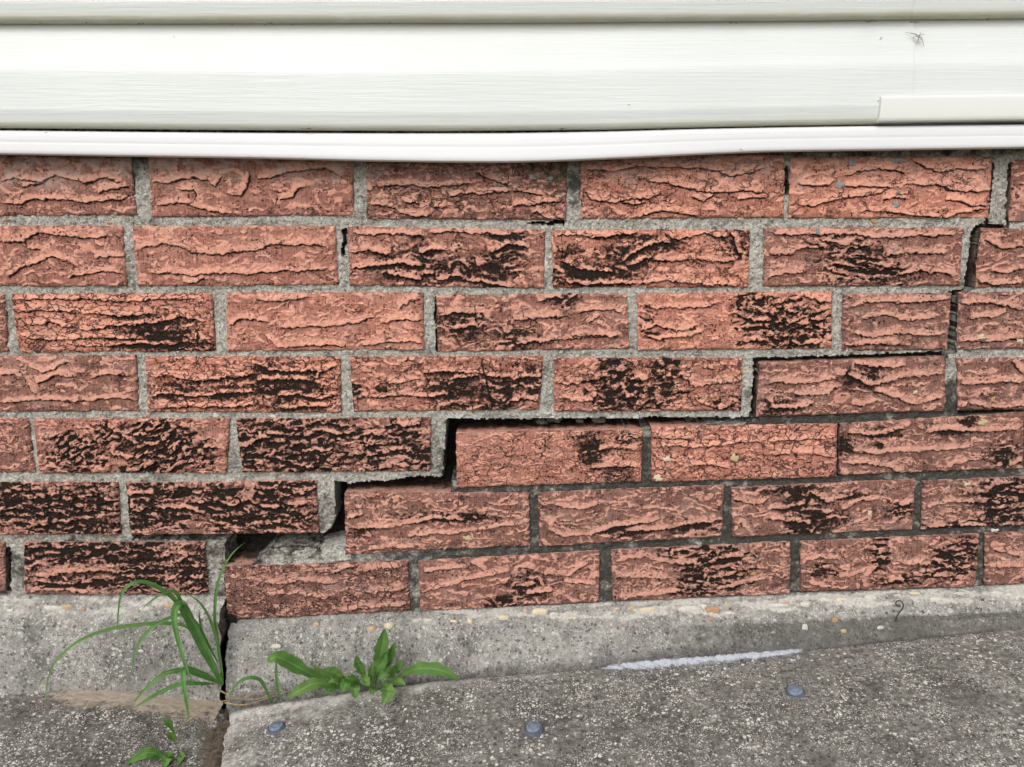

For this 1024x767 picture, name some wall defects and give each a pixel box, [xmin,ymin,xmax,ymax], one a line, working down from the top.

crack [341,228,349,255]
crack [527,218,564,226]
crack [972,195,1006,231]
crack [432,296,440,350]
crack [741,351,942,417]
crack [391,359,644,480]
crack [958,407,1011,415]
crack [319,481,349,534]
crack [228,533,278,563]
crack [225,601,237,649]